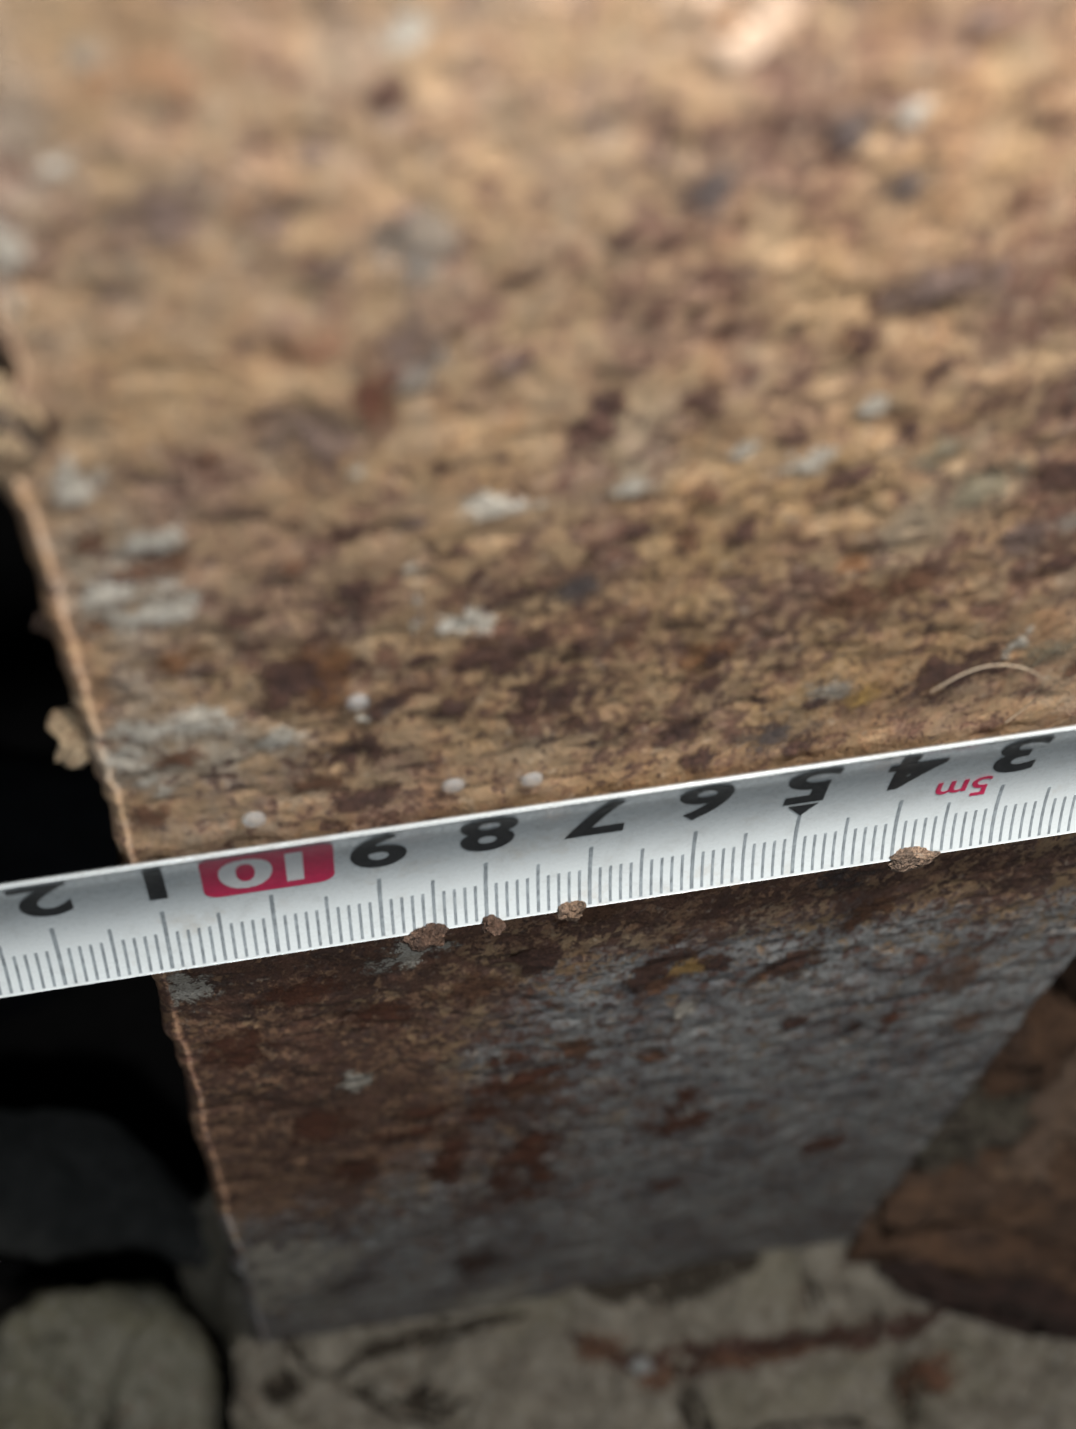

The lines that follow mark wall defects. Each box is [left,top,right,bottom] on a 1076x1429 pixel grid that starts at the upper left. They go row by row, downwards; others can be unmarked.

rust [364,74,411,114]
rust [0,376,62,486]
rust [564,387,630,448]
rust [402,632,600,734]
rust [895,640,1014,704]
rust [47,705,91,769]
rust [291,692,413,814]
rust [653,697,829,774]
rust [665,888,720,900]
rust [809,864,883,891]
rust [425,902,623,1007]
rust [622,932,734,997]